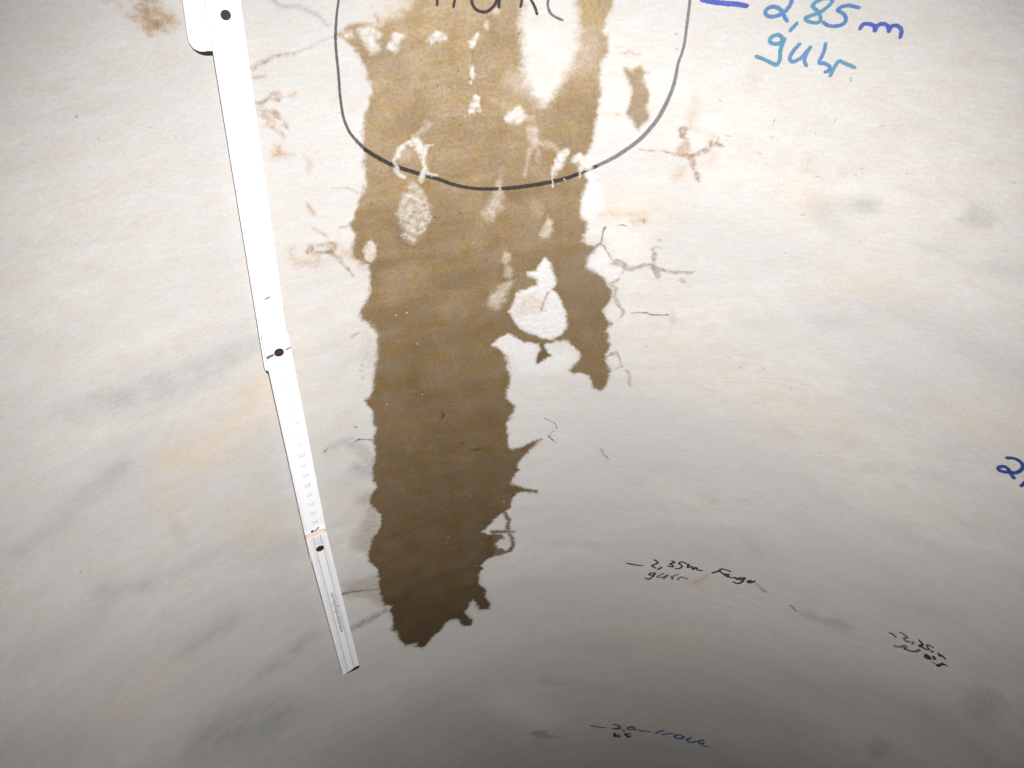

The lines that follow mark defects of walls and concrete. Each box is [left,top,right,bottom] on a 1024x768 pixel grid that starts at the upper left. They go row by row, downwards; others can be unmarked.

leakage [337,0,628,647]
crack [597,227,693,316]